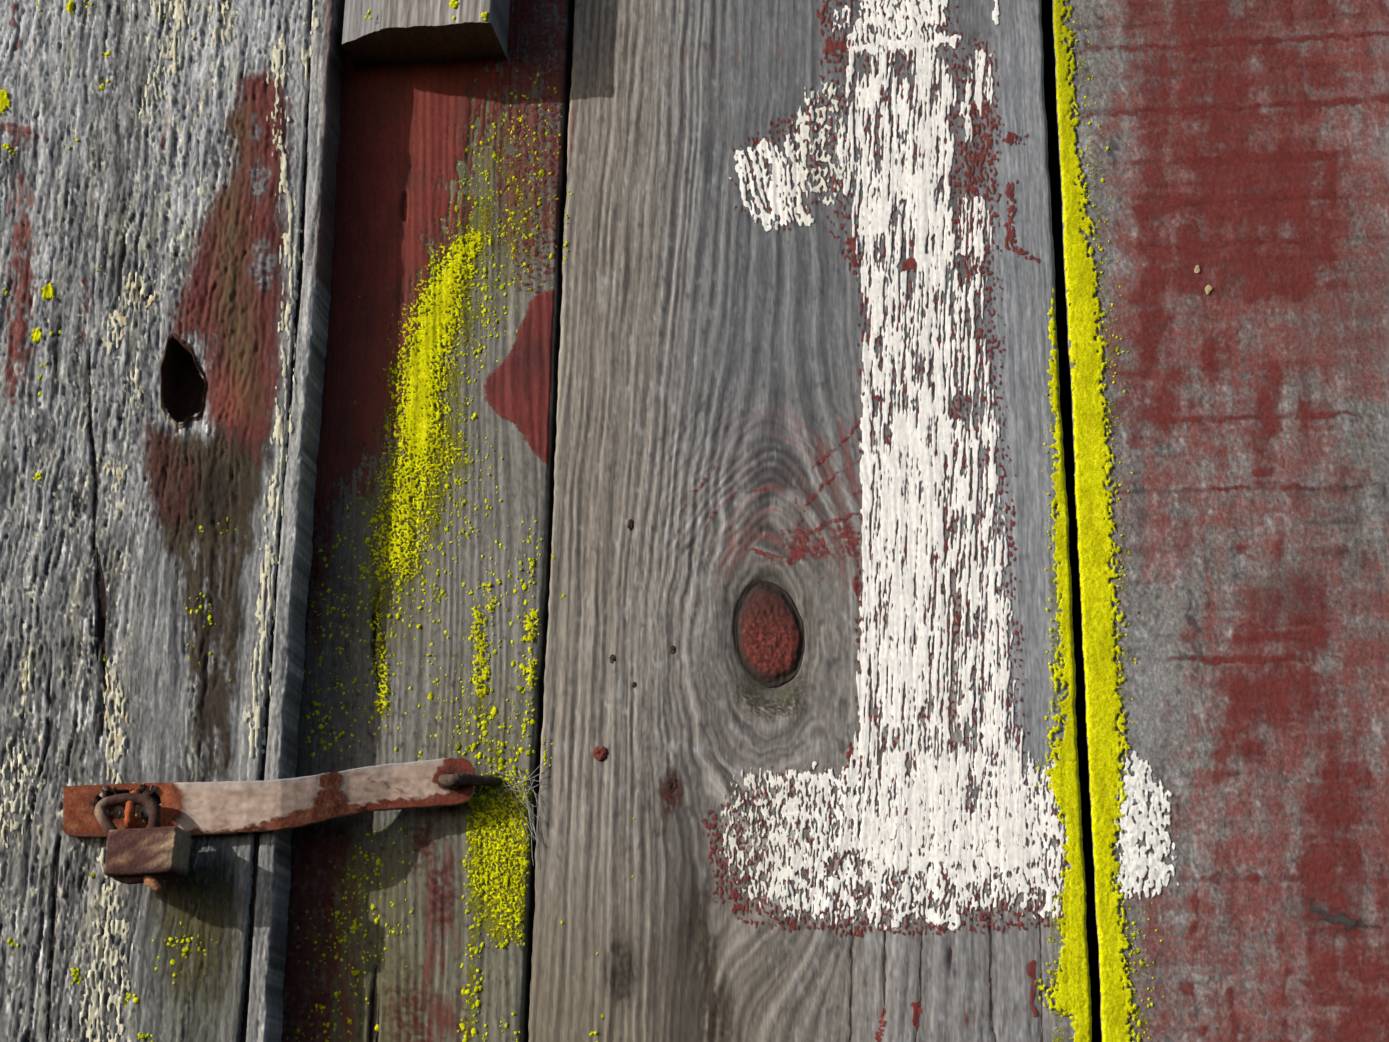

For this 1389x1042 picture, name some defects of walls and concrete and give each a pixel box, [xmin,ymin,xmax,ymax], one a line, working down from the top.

crack [88,352,107,736]
peeling [103,451,128,492]
peeling [145,427,201,543]
peeling [169,0,319,758]
peeling [701,0,1068,937]
peeling [1116,362,1314,490]
peeling [1092,0,1389,381]
peeling [1299,402,1352,426]
corrosion [63,758,473,836]
peeling [1174,582,1389,1042]